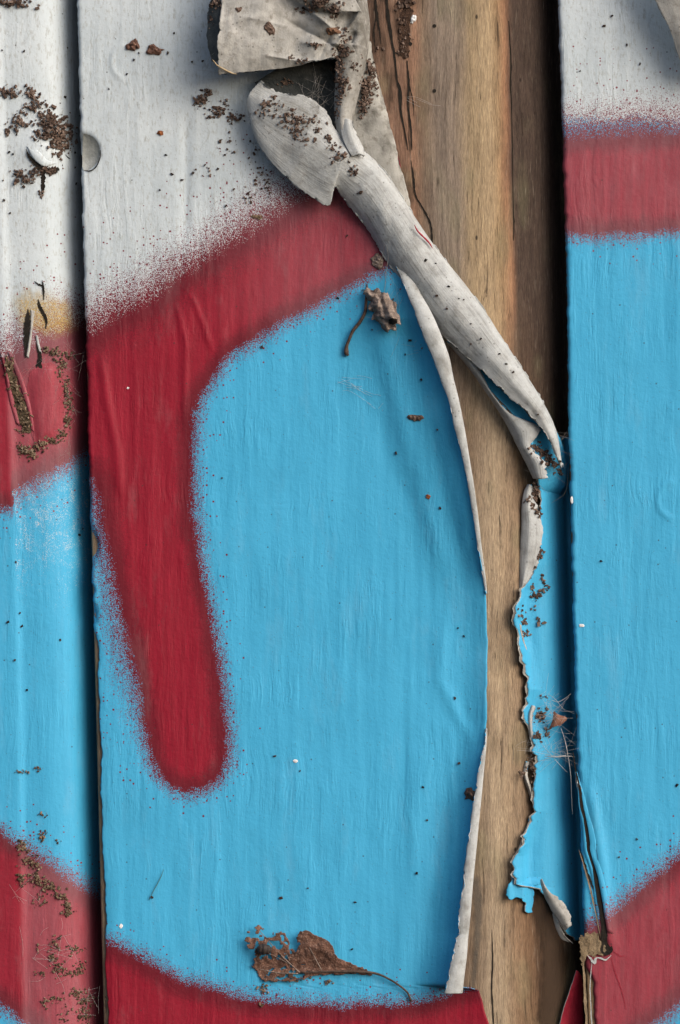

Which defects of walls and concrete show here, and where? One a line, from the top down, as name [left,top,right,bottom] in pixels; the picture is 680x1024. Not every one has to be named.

crack [373,0,433,243]
peeling [206,0,613,1024]